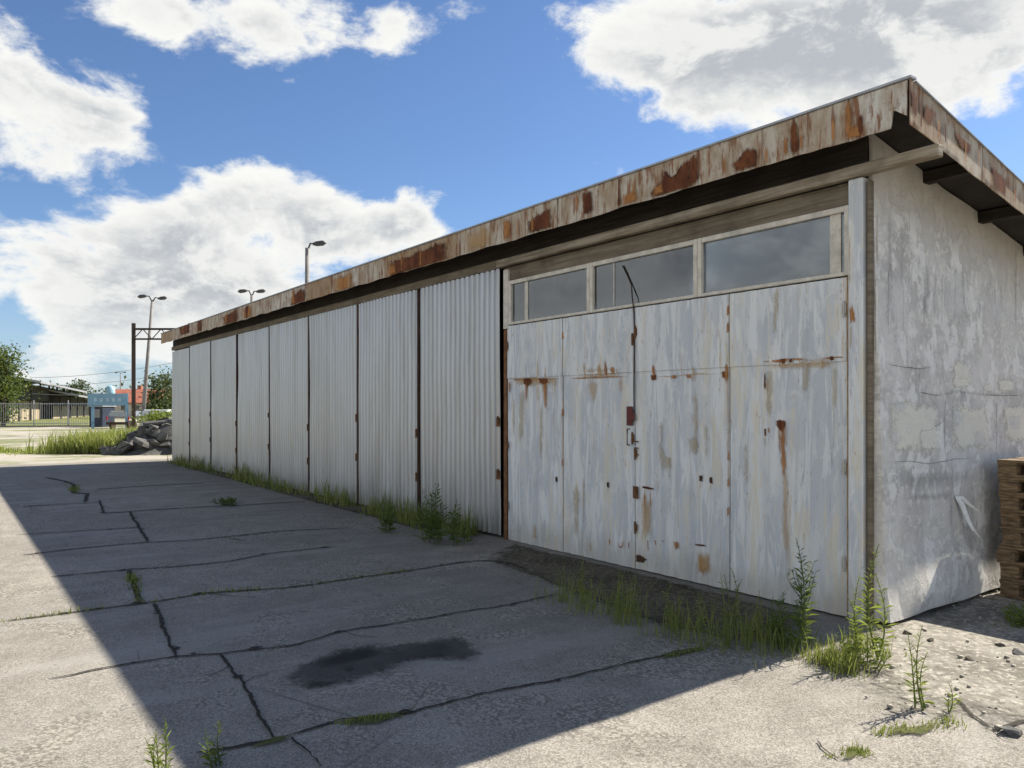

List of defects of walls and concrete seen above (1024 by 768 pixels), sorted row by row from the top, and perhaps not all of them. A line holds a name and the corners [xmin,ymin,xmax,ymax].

corrosion [784,119,803,155]
corrosion [651,154,699,196]
corrosion [724,148,768,175]
corrosion [576,191,592,214]
corrosion [503,209,551,239]
corrosion [388,242,446,275]
corrosion [179,320,202,335]
corrosion [223,306,251,324]
corrosion [651,366,704,380]
corrosion [764,420,788,547]
corrosion [609,486,678,563]
crack [5,477,664,766]